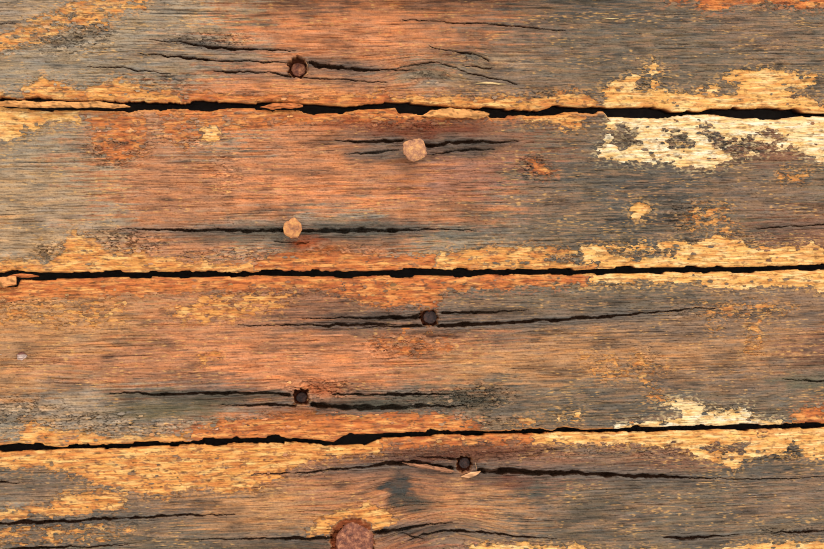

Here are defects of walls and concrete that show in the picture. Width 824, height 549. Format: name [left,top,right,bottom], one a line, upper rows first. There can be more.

crack [87,39,517,85]
peeling [0,56,824,169]
crack [238,307,715,328]
crack [109,391,467,411]
peeling [0,351,824,546]